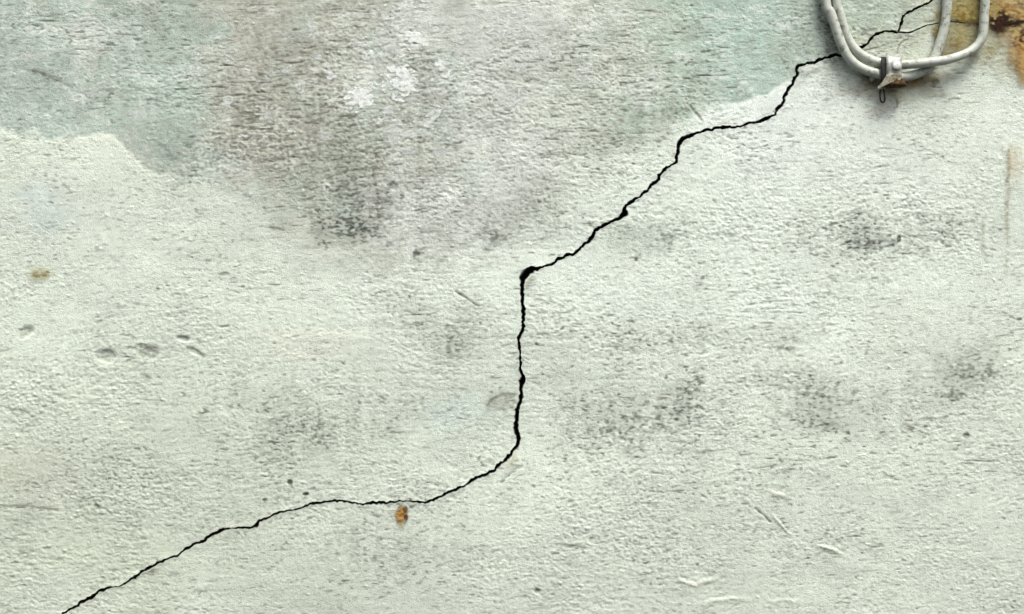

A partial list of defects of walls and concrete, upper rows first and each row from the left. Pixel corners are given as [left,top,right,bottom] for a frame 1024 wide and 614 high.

crack [859,0,960,51]
corrosion [933,0,1024,76]
crack [62,53,842,614]
corrosion [395,506,408,523]